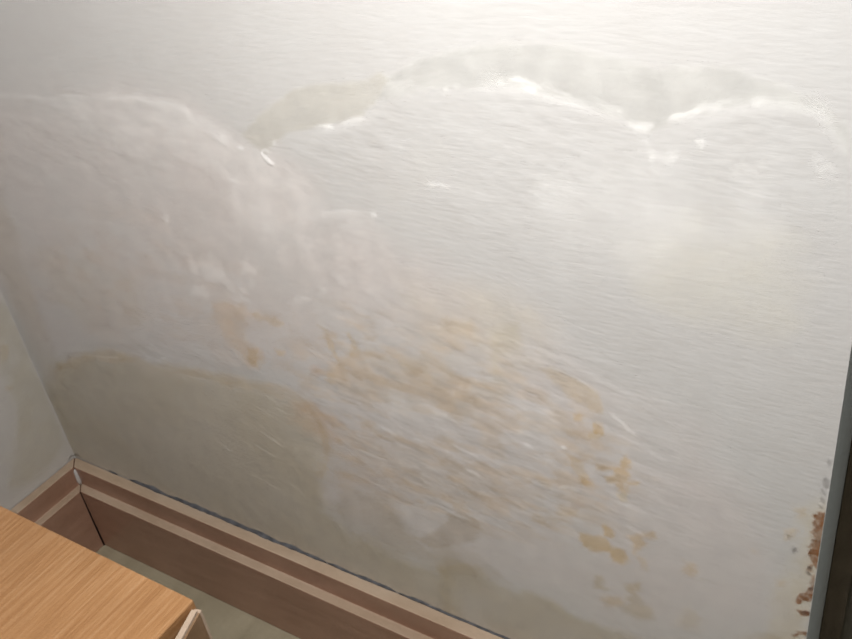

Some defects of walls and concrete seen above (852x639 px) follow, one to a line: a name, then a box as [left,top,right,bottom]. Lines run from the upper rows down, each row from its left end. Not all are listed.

water stain [130,479,510,639]